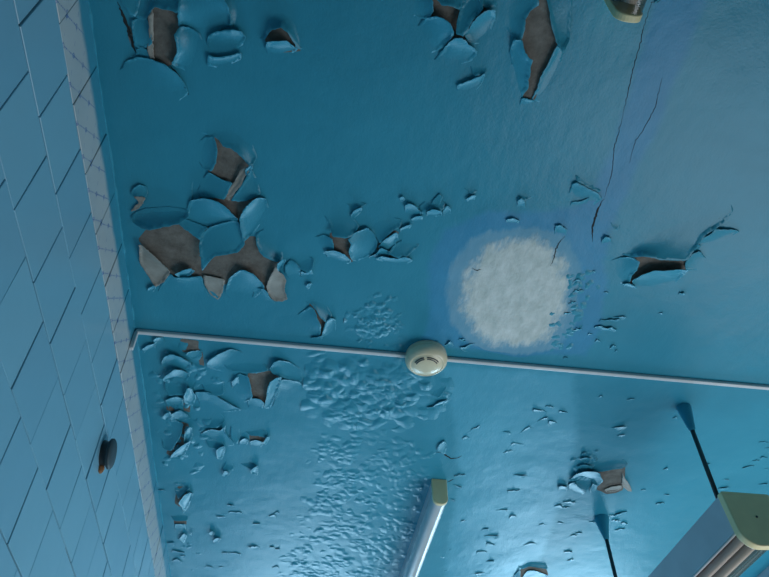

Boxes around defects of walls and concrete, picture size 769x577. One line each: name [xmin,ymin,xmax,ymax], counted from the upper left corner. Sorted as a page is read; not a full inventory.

peeling [120,0,246,100]
peeling [260,13,302,54]
peeling [414,0,497,90]
peeling [507,0,572,105]
crack [591,0,662,242]
peeling [131,130,314,303]
peeling [315,193,451,264]
peeling [613,205,739,289]
peeling [298,302,336,340]
peeling [161,339,302,476]
peeling [558,453,646,495]
peeling [513,562,548,577]